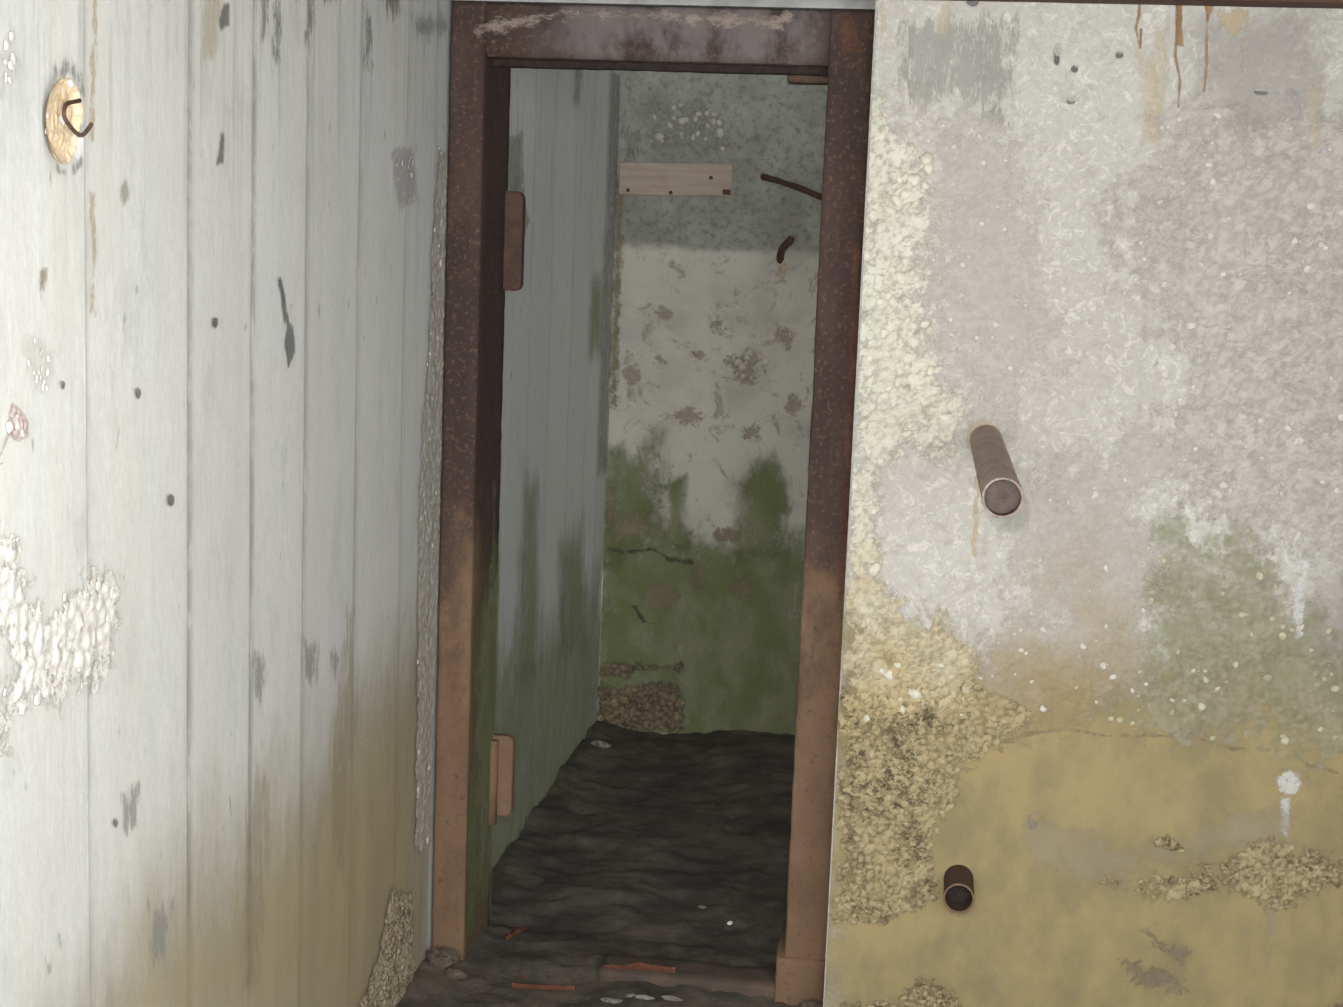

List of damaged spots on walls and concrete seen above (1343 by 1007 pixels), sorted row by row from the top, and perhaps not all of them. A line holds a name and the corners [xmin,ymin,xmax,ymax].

water stain [219,3,229,29]
water stain [261,0,281,61]
rust [1174,5,1183,108]
rust [1203,6,1249,92]
water stain [714,462,786,557]
spalling [830,90,1032,926]
water stain [124,785,140,833]
water stain [129,671,421,1007]
water stain [825,549,1343,1007]